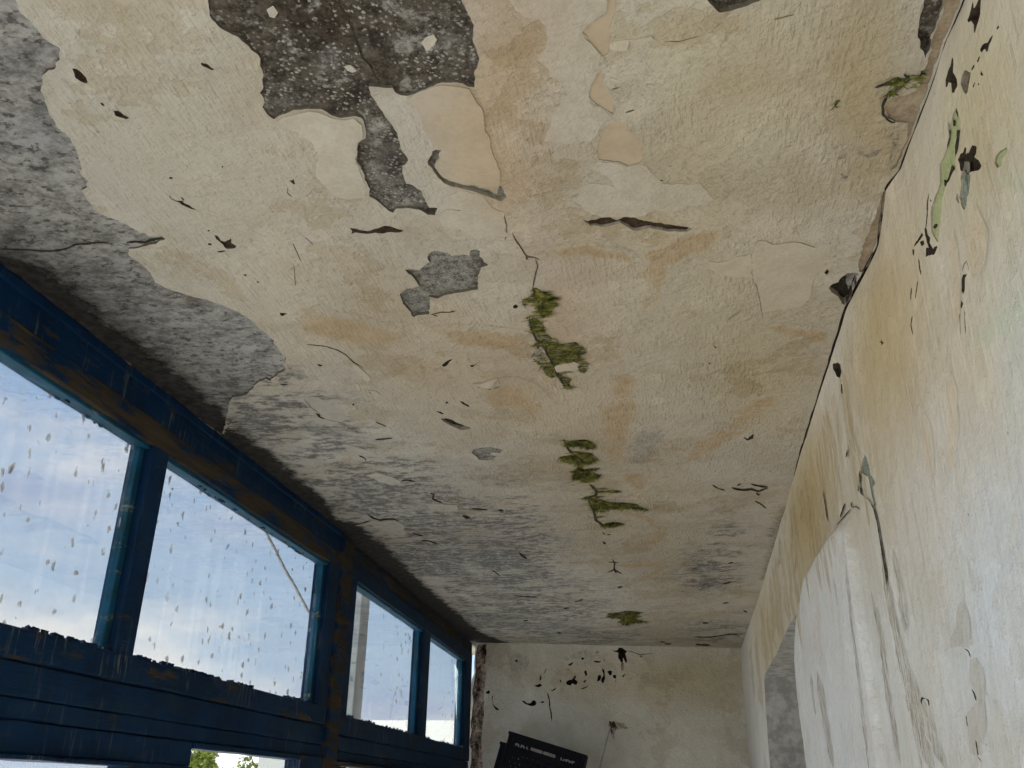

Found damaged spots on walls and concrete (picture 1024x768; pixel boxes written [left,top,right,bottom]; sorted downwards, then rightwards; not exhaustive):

spalling [208,0,506,215]
flaking render [510,0,713,232]
spalling [944,109,981,210]
spalling [995,148,1007,168]
flaking render [0,0,288,434]
spalling [400,249,488,317]
crack [504,215,540,286]
flaking render [912,224,938,257]
water stain [0,256,604,676]
crack [823,452,888,591]
flaking render [522,648,627,706]